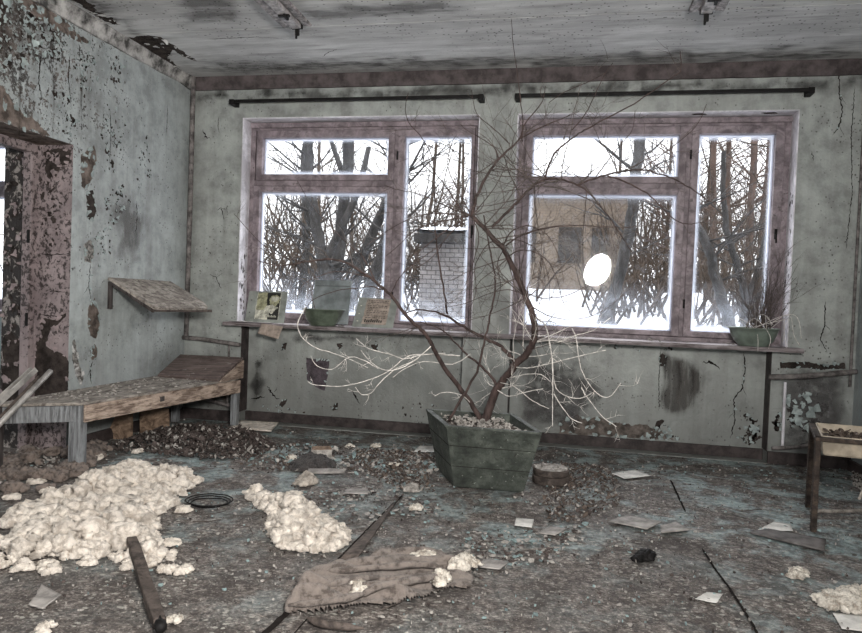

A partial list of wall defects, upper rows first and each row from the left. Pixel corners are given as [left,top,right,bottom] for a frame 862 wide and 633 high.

peeling [72,0,120,25]
peeling [0,0,99,137]
peeling [129,35,196,68]
peeling [38,103,131,267]
peeling [0,201,23,401]
peeling [33,311,85,396]
spalling [87,298,100,360]
peeling [306,358,329,391]
water stain [662,356,699,412]
peeling [772,391,821,433]
crack [670,480,686,512]
crack [702,548,758,633]